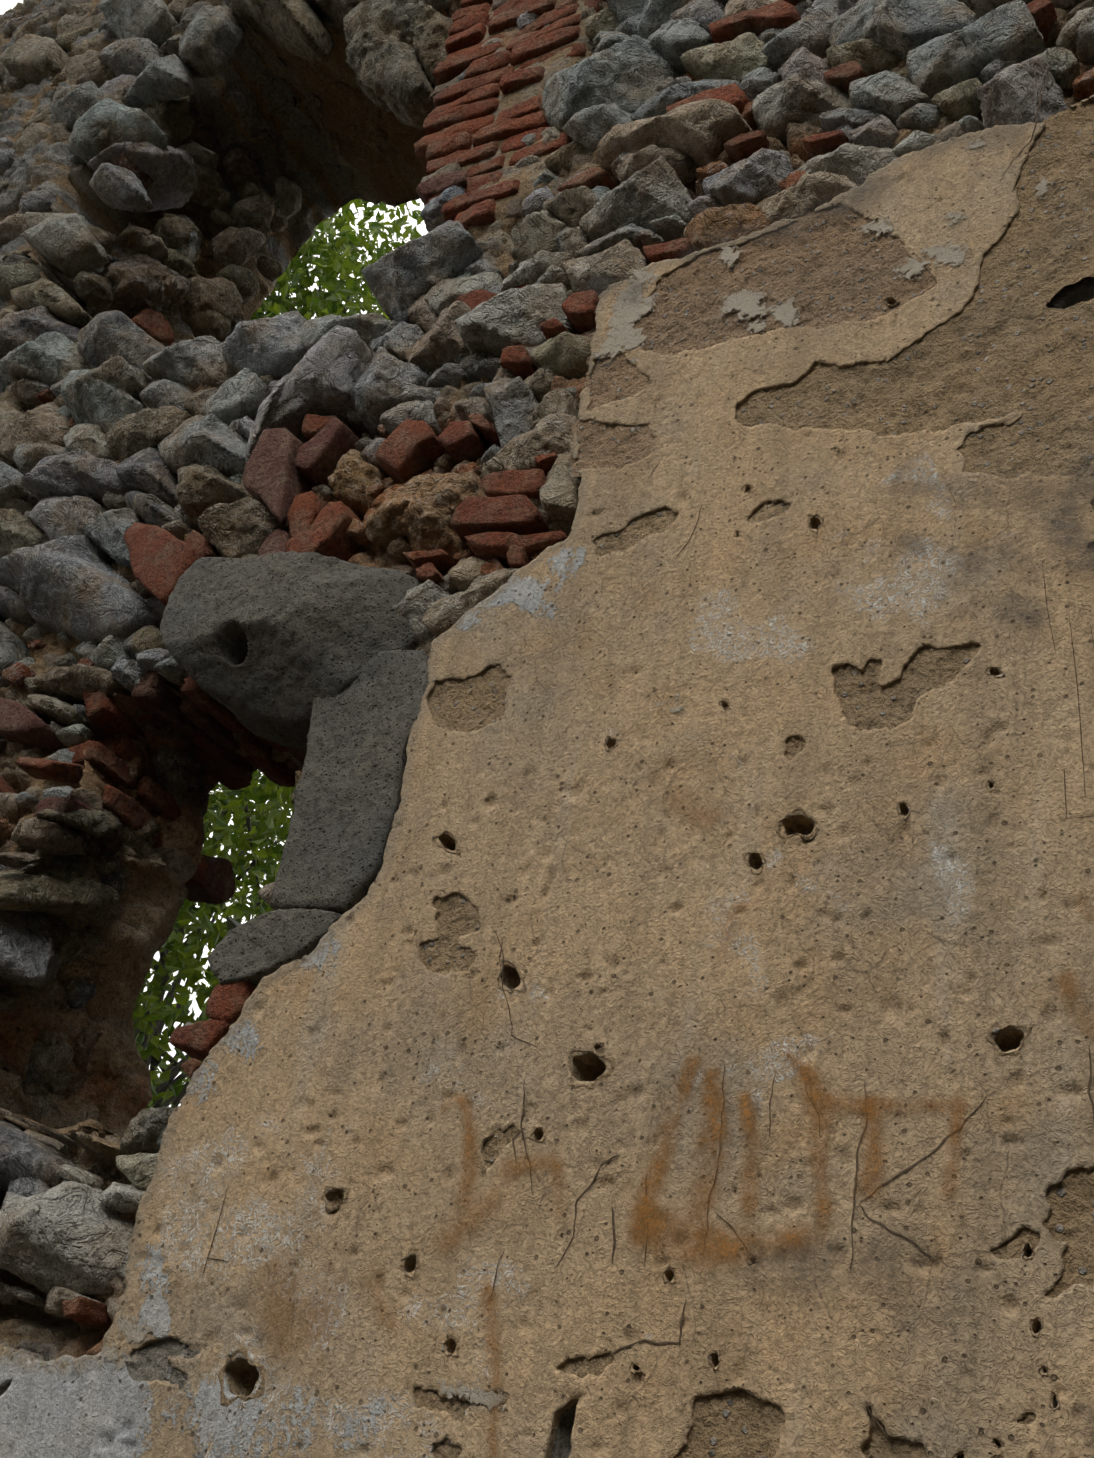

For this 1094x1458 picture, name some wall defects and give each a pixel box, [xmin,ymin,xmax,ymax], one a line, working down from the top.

spalling [570,95,1094,479]
spalling [593,508,679,557]
spalling [420,665,511,733]
spalling [832,644,981,731]
spalling [409,894,480,981]
crack [769,1071,820,1137]
crack [702,1065,752,1256]
crack [850,1083,988,1270]
spalling [990,1168,1094,1298]
spalling [100,1309,205,1391]
spalling [558,1353,614,1378]
spalling [675,1389,785,1458]